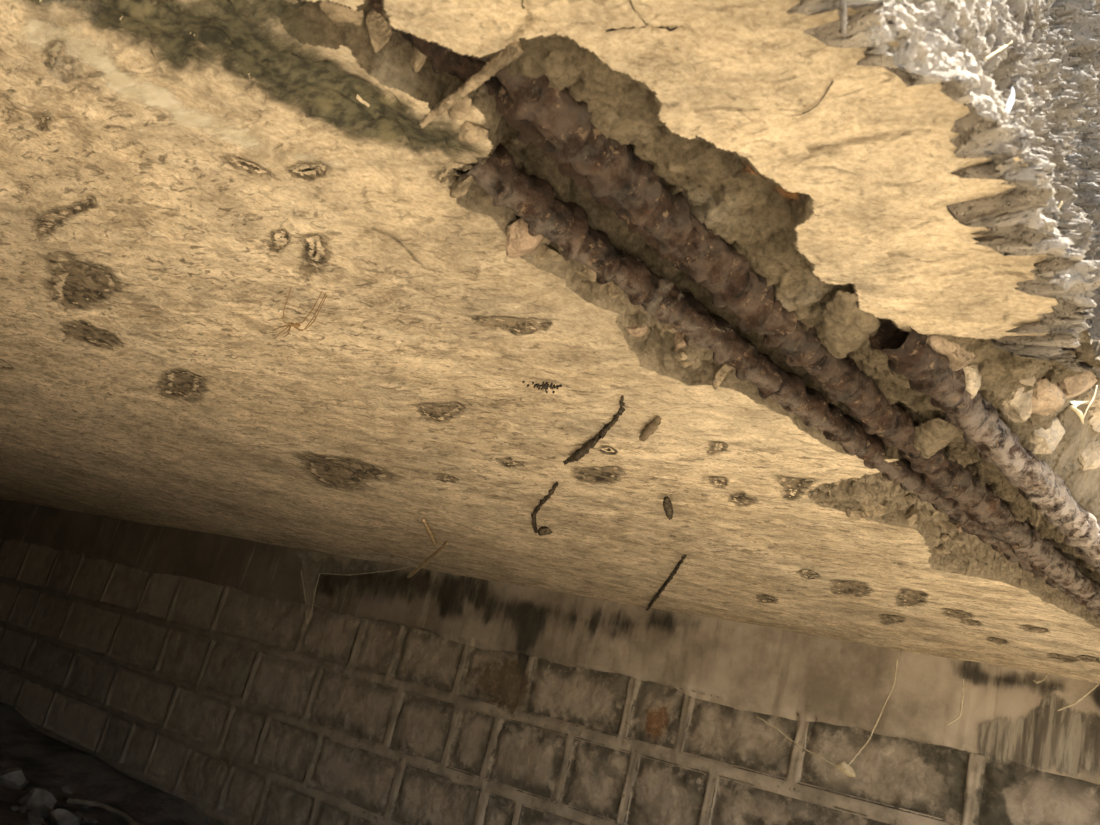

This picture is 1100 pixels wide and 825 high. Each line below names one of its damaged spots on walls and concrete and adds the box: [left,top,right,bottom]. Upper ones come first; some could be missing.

crack [606,0,687,32]
spalling [225,155,271,180]
spalling [267,229,330,279]
spalling [279,0,1100,629]
spalling [157,369,210,403]
damp [315,558,550,715]
damp [589,609,601,634]
spalling [1020,625,1050,633]
spalling [1047,654,1100,663]
damp [961,661,1100,775]